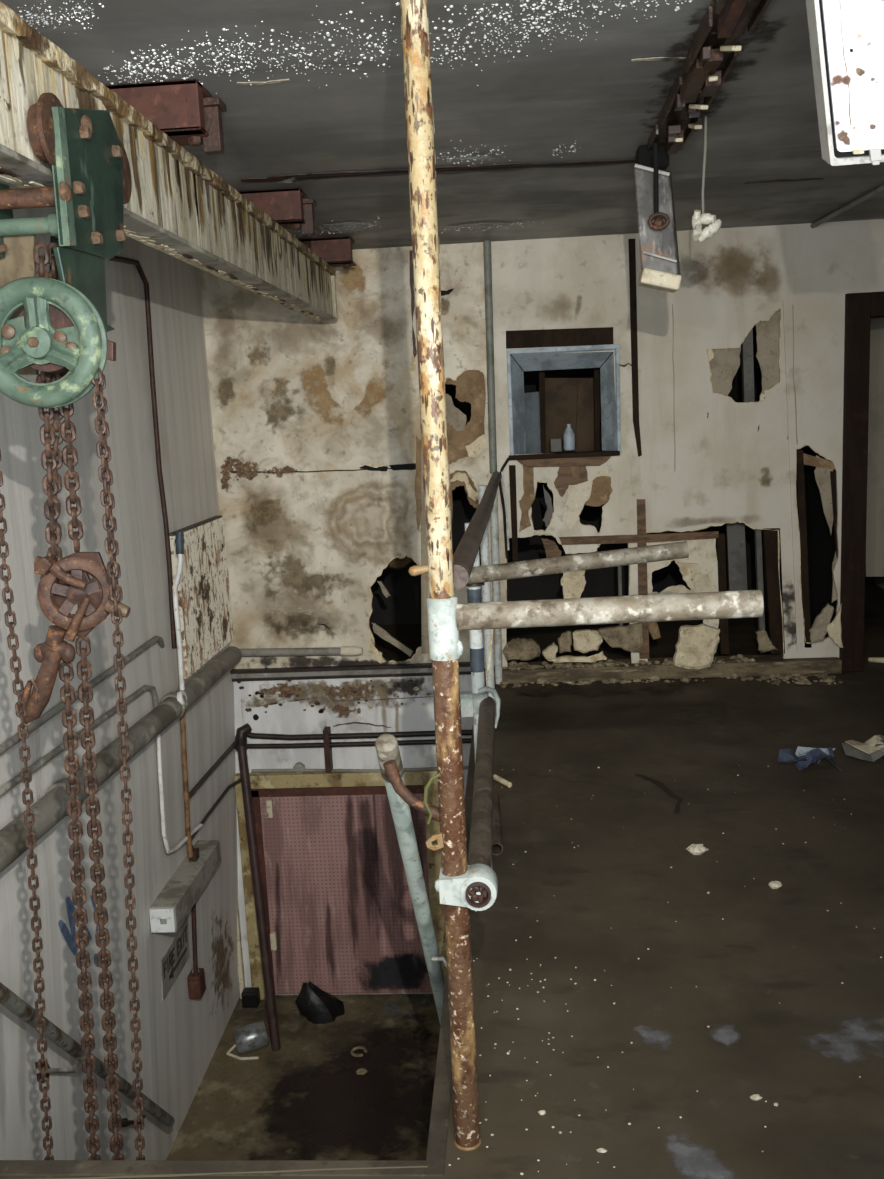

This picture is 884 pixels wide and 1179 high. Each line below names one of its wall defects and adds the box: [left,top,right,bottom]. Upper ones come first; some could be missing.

corrosion [833,0,878,145]
spalling [220,0,486,583]
leakage [219,379,234,406]
leakage [267,359,343,425]
leakage [355,378,385,414]
spalling [707,309,781,403]
peeling [518,465,613,558]
leakage [265,615,334,638]
leakage [266,555,348,599]
spalling [233,555,437,773]
spalling [561,570,586,599]
spalling [646,521,784,659]